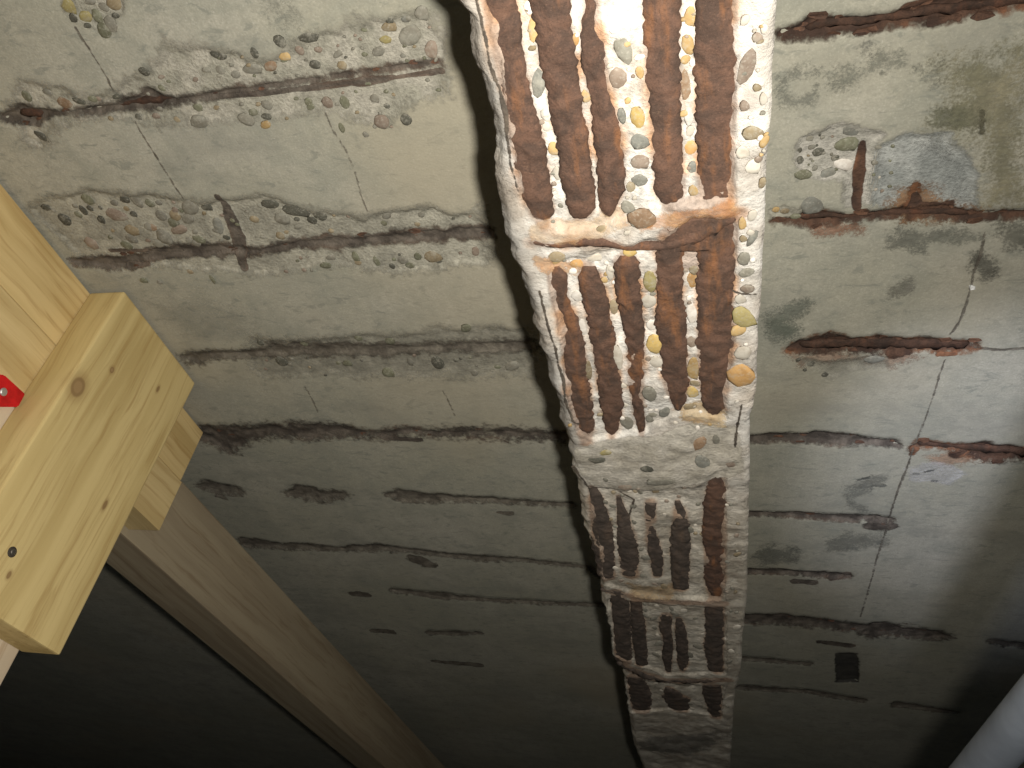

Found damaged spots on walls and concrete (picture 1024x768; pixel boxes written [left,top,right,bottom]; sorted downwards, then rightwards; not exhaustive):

rust [786,11,878,36]
rust [970,11,996,21]
spalling [5,0,453,149]
spalling [486,5,522,180]
spalling [28,187,496,284]
rust [772,208,869,237]
rust [882,182,1006,226]
rust [532,256,582,276]
spalling [516,0,980,717]
rust [681,402,726,428]
crack [860,359,946,617]
rust [627,582,675,601]